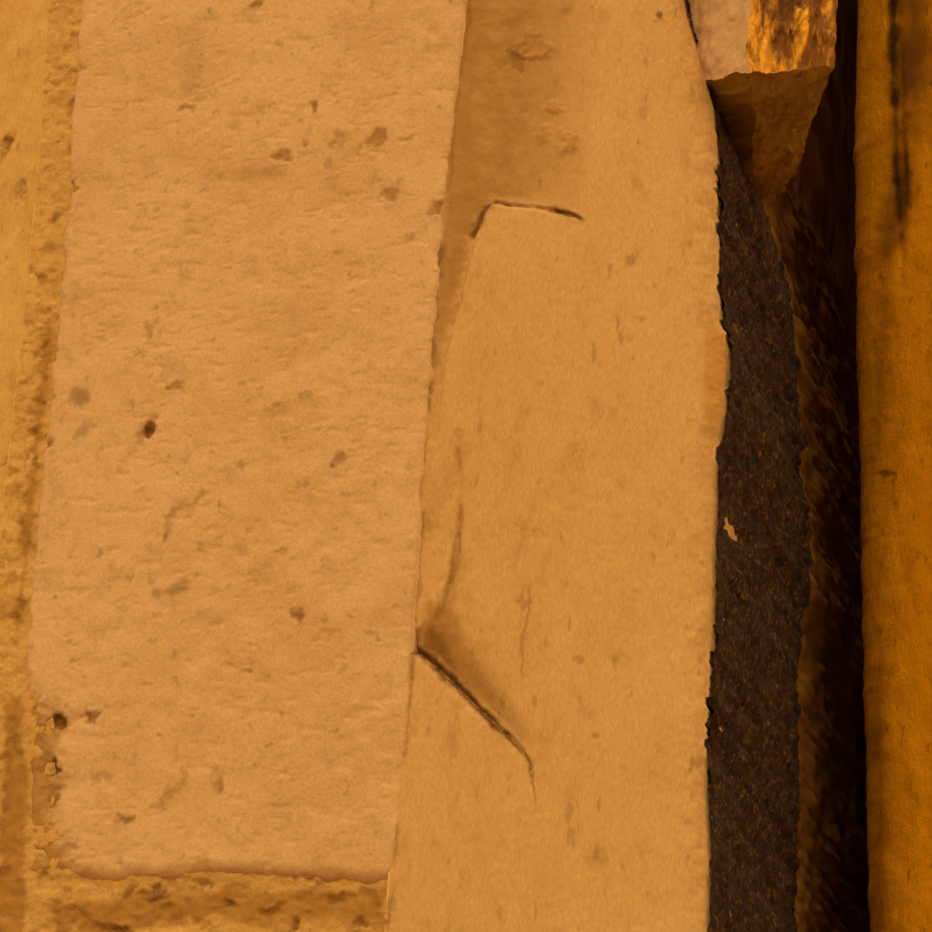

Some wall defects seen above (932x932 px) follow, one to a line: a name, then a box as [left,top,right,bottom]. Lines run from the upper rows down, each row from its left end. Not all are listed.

crack [412,652,518,748]